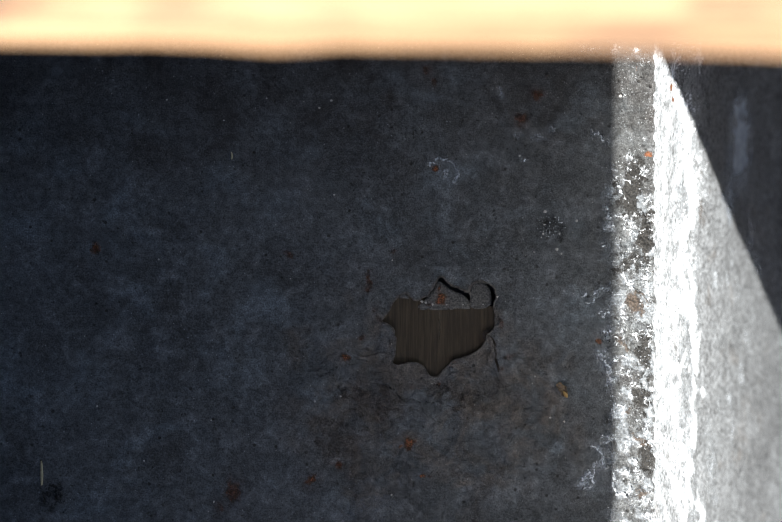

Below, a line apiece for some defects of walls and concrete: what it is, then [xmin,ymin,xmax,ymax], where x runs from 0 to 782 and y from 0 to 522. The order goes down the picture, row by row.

peeling [418,281,492,310]
damp [577,53,709,522]